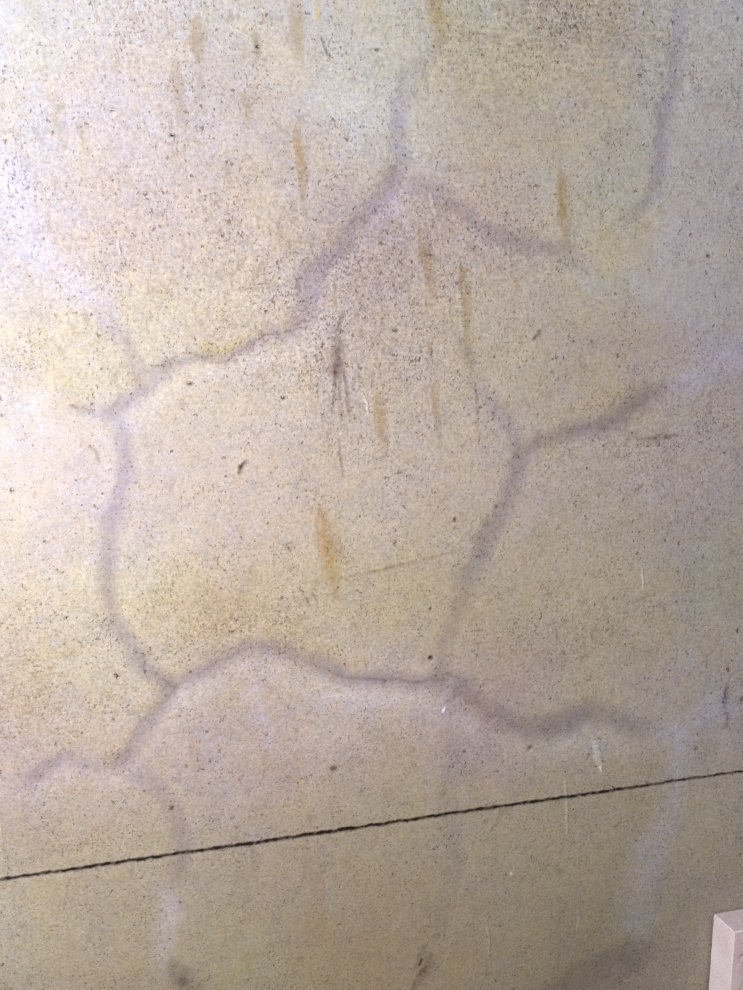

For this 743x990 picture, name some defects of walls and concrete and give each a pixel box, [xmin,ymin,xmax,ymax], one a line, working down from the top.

damp [167,12,208,134]
rust [422,0,451,48]
damp [290,123,309,222]
rust [553,168,573,249]
damp [323,312,352,423]
damp [236,458,249,476]
crack [20,39,671,887]
damp [371,389,390,460]
rust [311,504,344,605]
damp [610,686,743,947]
damp [136,876,192,990]
crack [418,815,467,990]